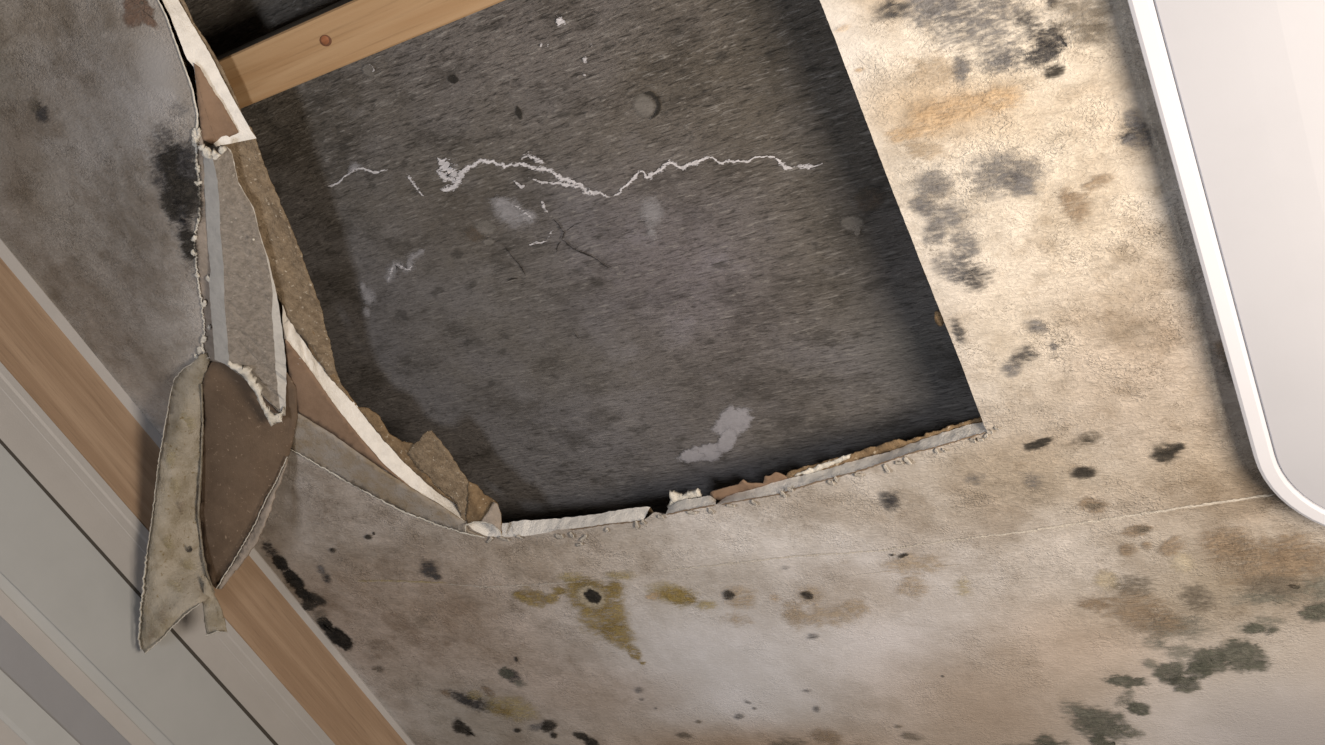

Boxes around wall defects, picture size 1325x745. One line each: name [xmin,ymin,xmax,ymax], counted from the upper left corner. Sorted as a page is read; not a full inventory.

damp [151,124,203,260]
crack [329,154,823,281]
damp [877,0,1109,289]
peeling [291,414,523,543]
damp [263,543,353,651]
damp [421,563,442,580]
damp [513,572,645,665]
damp [648,582,753,621]
damp [773,589,864,638]
damp [1065,526,1325,745]
damp [442,657,557,738]
damp [573,732,598,745]